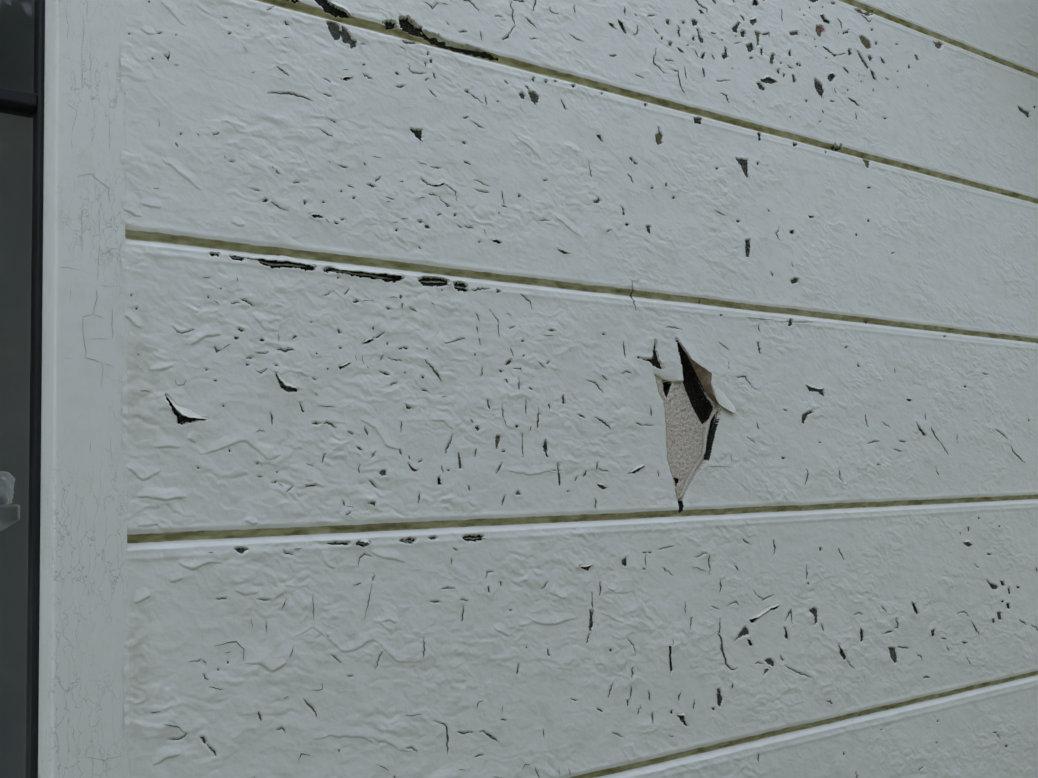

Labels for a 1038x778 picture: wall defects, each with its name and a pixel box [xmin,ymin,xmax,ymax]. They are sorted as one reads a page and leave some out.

spalling [315,0,357,49]
spalling [382,18,498,61]
peeling [732,0,801,90]
peeling [809,0,834,37]
peeling [831,29,885,80]
peeling [805,72,835,102]
spalling [210,253,404,283]
spalling [418,277,470,292]
peeling [166,394,209,425]
peeling [642,339,736,500]
peeling [736,604,779,646]